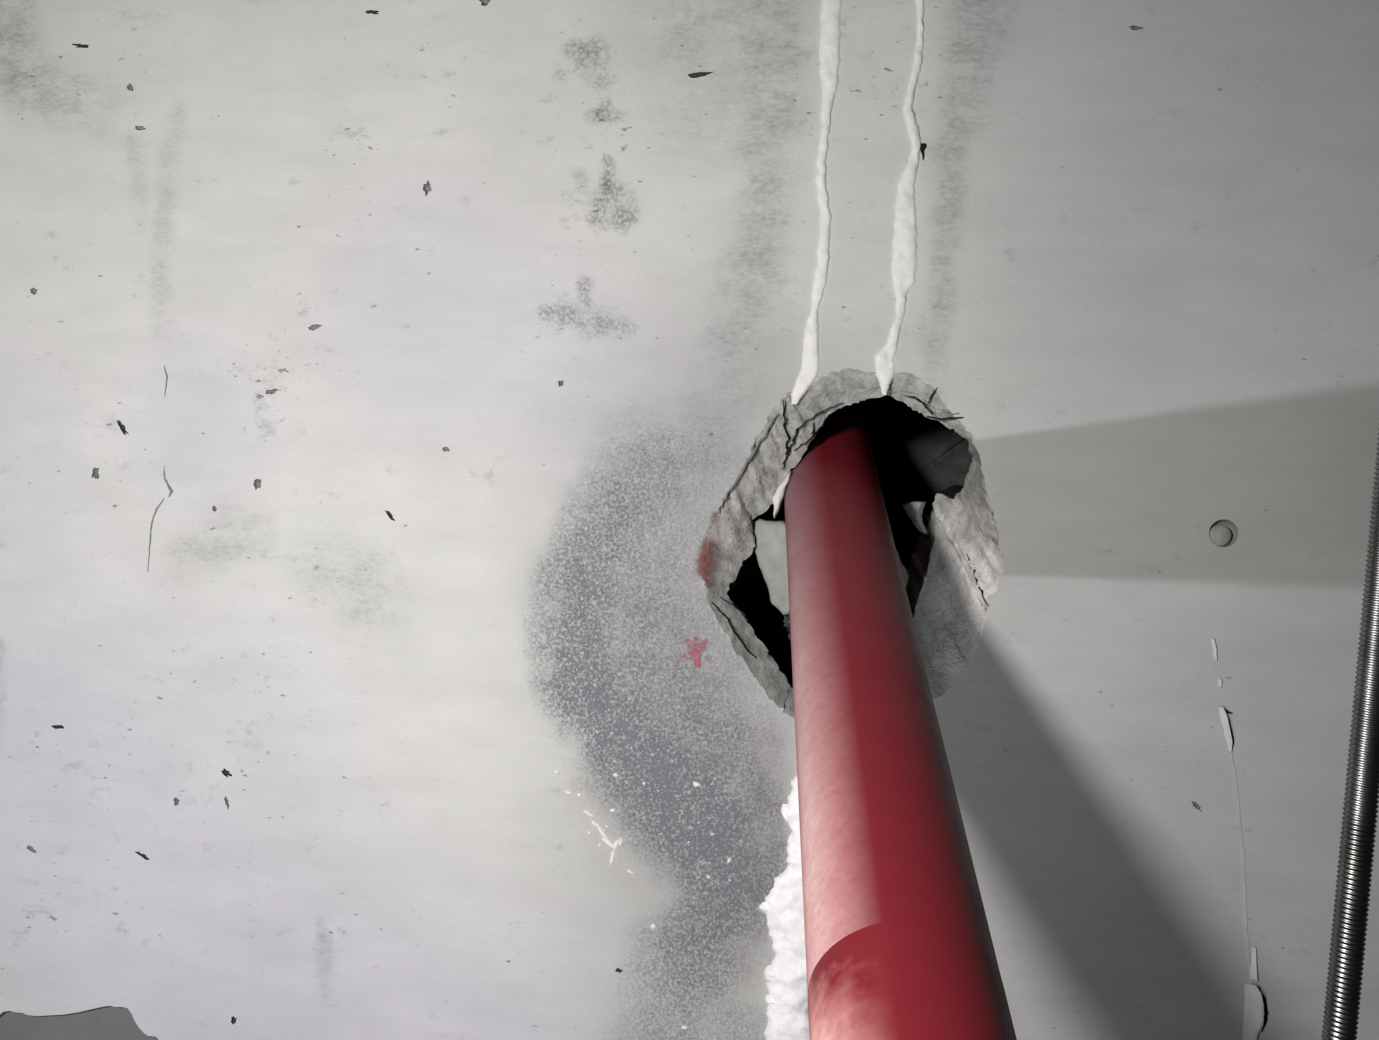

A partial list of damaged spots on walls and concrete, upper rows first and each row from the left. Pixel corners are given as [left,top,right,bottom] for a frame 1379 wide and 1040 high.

water stain [791,0,842,405]
water stain [875,0,927,395]
spalling [700,368,1004,717]
water stain [538,467,809,1040]
crack [1211,638,1269,1040]